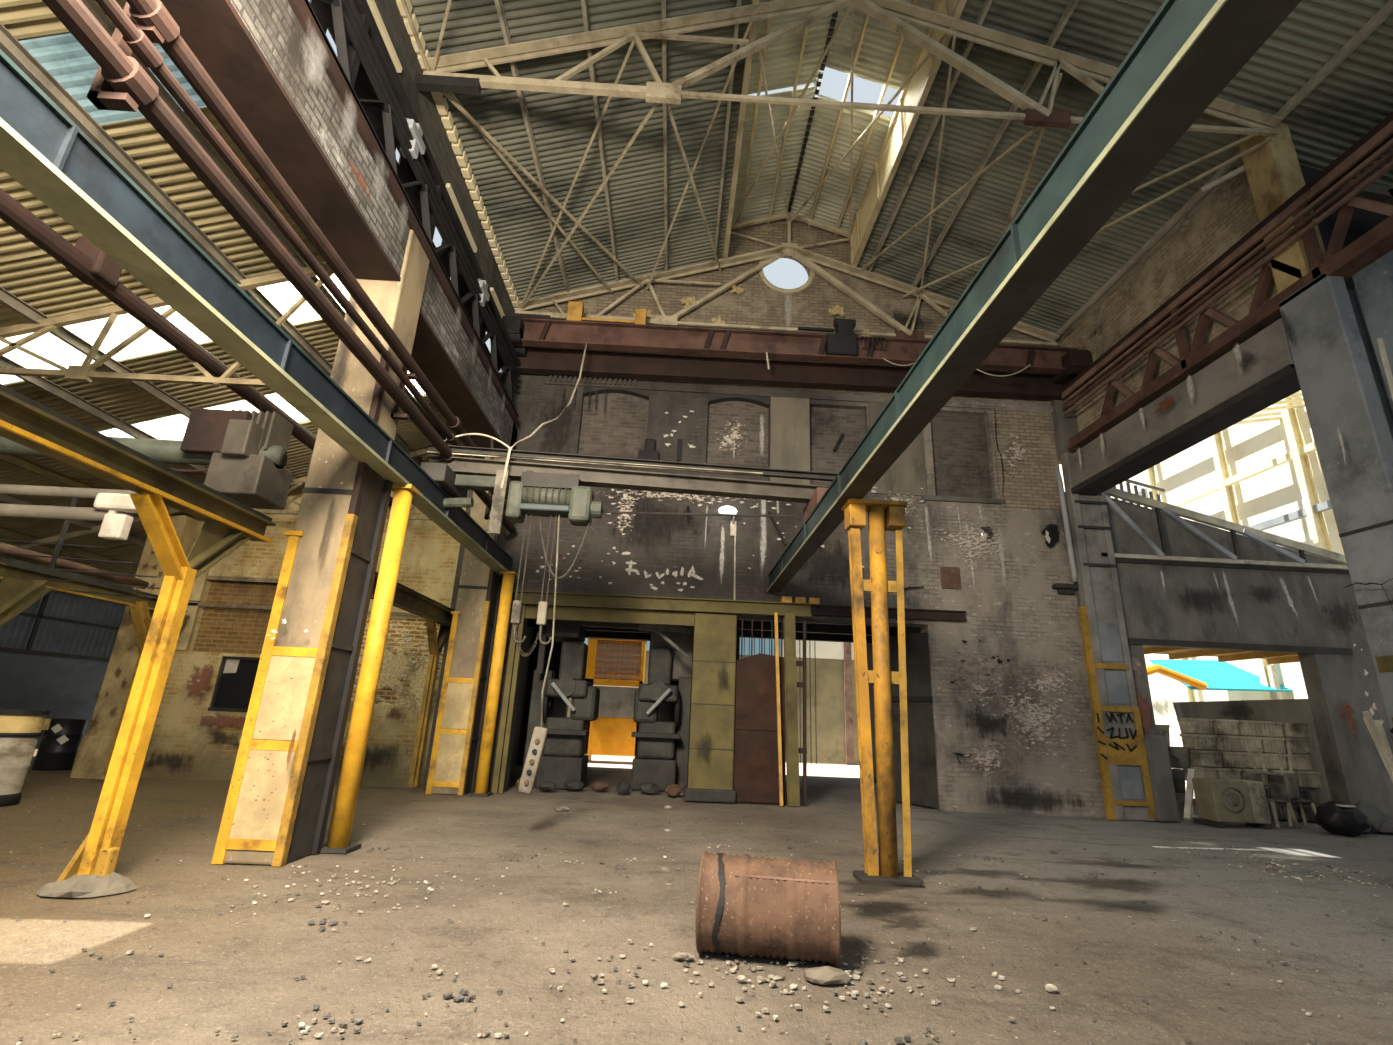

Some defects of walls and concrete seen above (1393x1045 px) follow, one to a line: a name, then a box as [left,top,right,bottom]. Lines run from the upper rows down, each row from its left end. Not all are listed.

peeling [716,420,752,453]
leakage [613,505,724,577]
peeling [599,488,796,592]
leakage [804,541,863,584]
spalling [178,658,251,729]
leakage [966,713,1006,736]
spalling [937,639,1085,782]
leakage [987,788,1084,810]